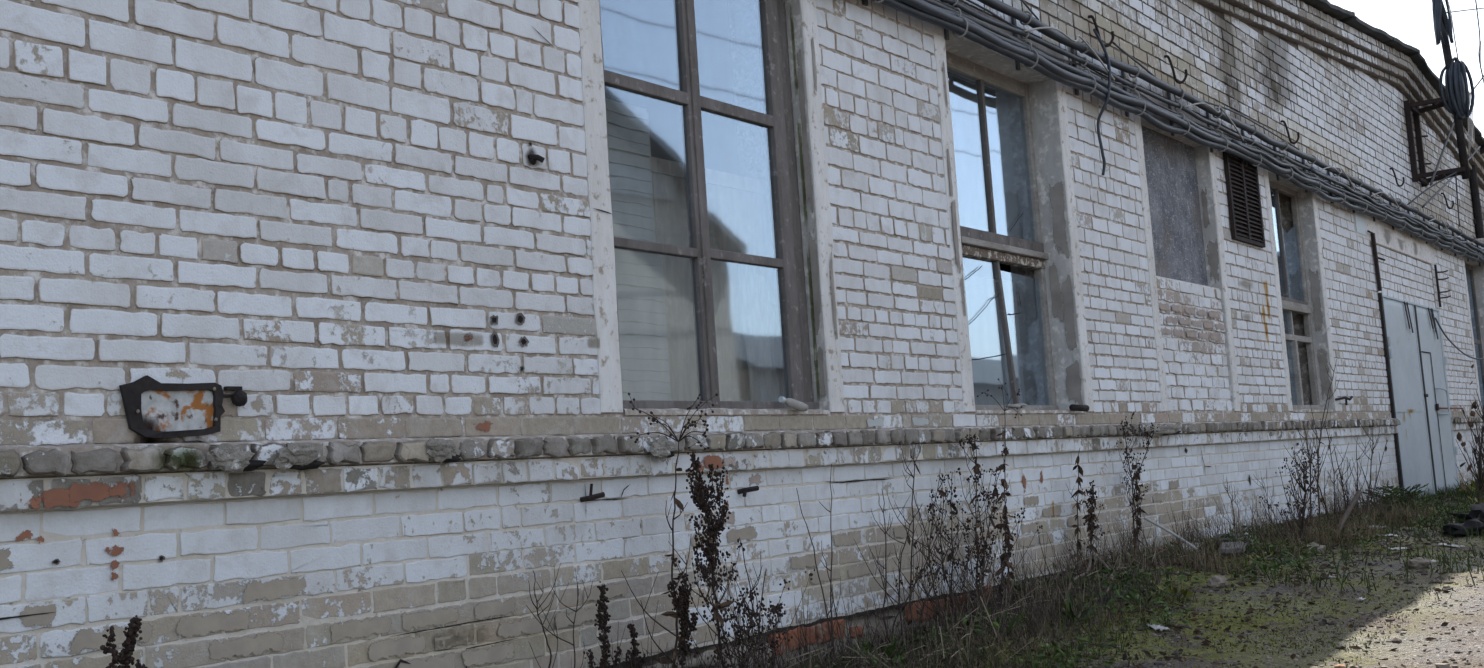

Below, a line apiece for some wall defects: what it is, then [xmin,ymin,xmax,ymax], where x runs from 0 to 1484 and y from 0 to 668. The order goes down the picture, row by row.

spalling [206,442,325,473]
spalling [426,437,461,463]
spalling [1141,424,1183,436]
peeling [20,481,136,511]
peeling [691,455,757,546]
peeling [1020,471,1082,547]
peeling [0,530,44,571]
peeling [105,528,124,580]
peeling [791,524,912,585]
peeling [20,604,56,627]
peeling [176,576,306,660]
peeling [68,623,153,655]